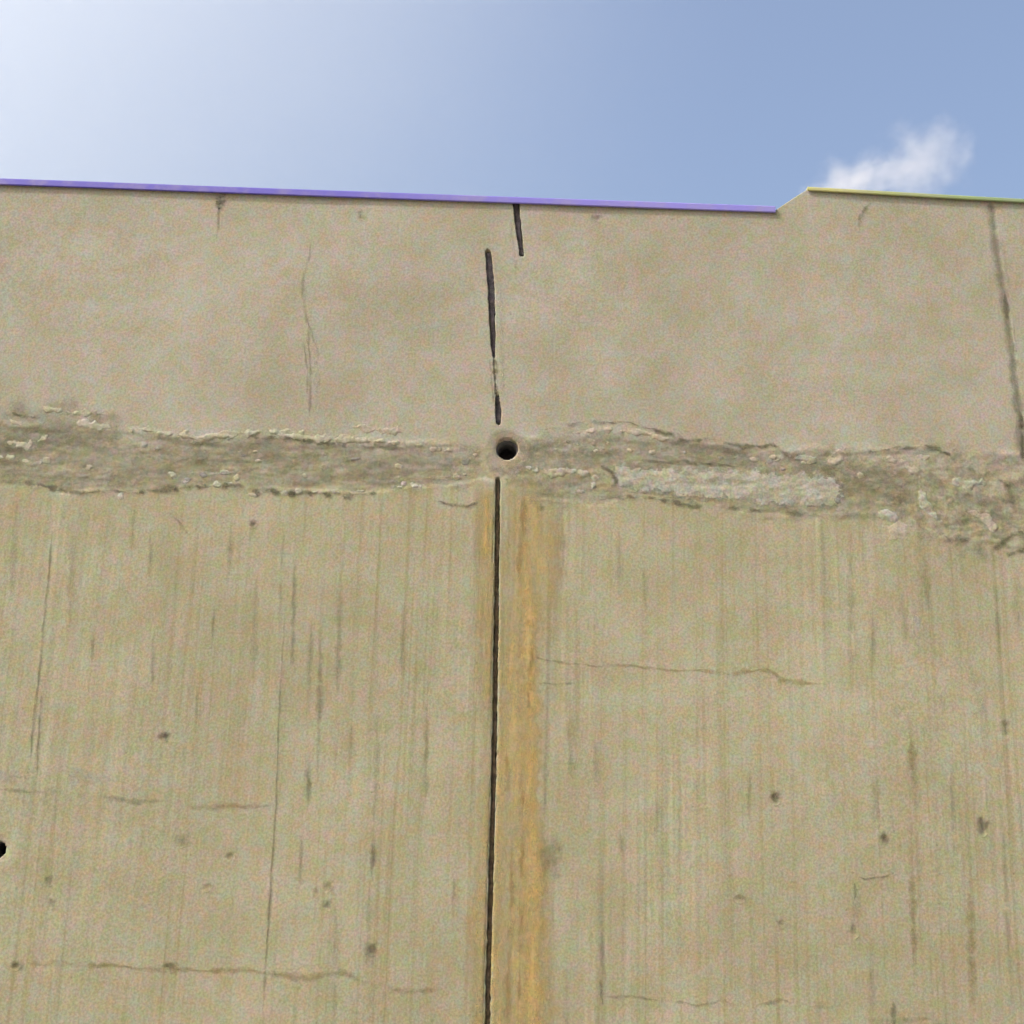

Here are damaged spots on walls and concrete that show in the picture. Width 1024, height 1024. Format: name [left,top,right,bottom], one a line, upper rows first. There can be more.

crack [513,204,524,255]
crack [486,253,502,423]
peeling [0,434,51,467]
peeling [43,406,111,433]
spalling [128,424,452,471]
spalling [554,422,865,479]
crack [1016,416,1024,458]
spalling [139,470,375,499]
spalling [525,465,698,507]
spalling [967,510,1024,555]
crack [486,481,500,1024]
corrosion [474,494,553,1024]